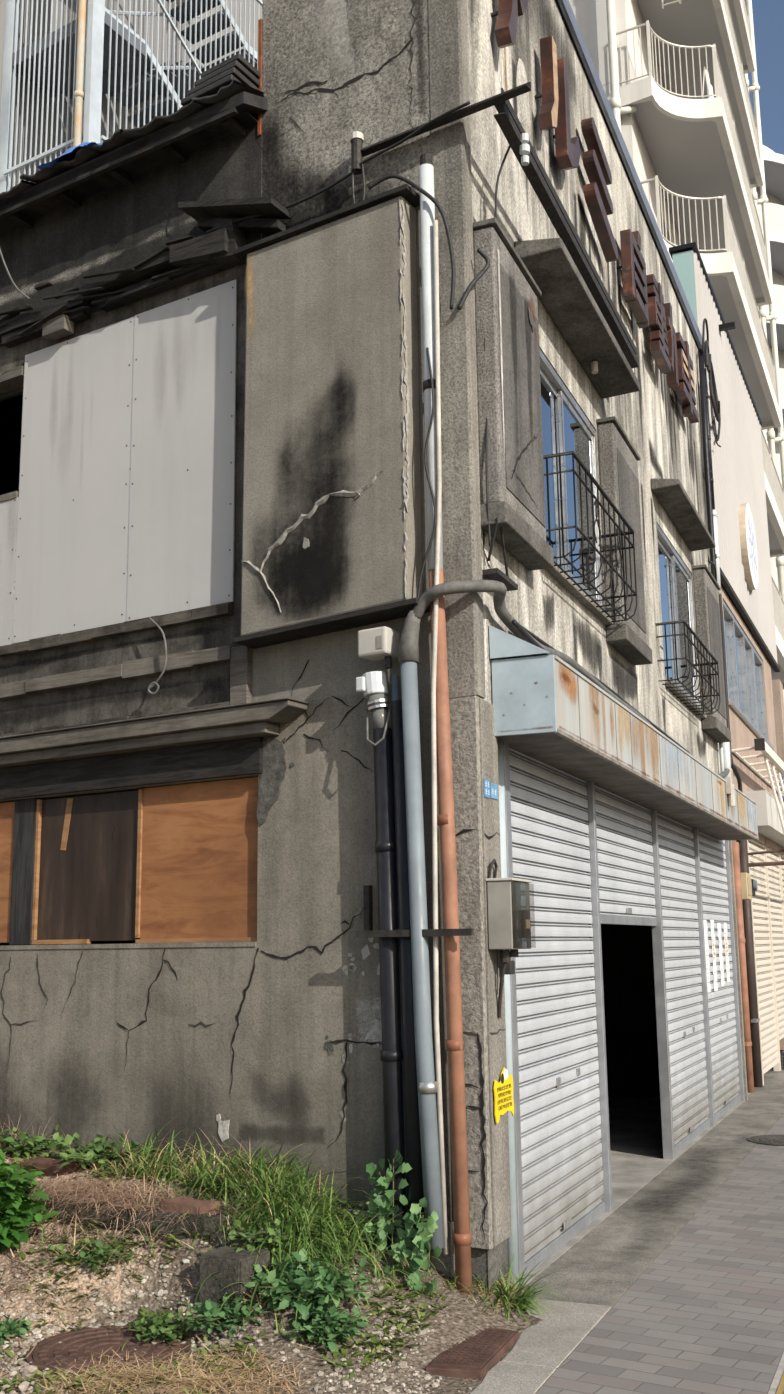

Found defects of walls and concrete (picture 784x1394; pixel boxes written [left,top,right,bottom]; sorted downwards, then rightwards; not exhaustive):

crack [275,0,418,140]
crack [242,470,382,612]
crack [286,660,374,772]
rust [560,666,659,782]
rust [717,779,757,836]
crack [0,951,83,1074]
crack [117,949,177,1069]
crack [189,907,364,1093]
crack [327,1039,382,1148]